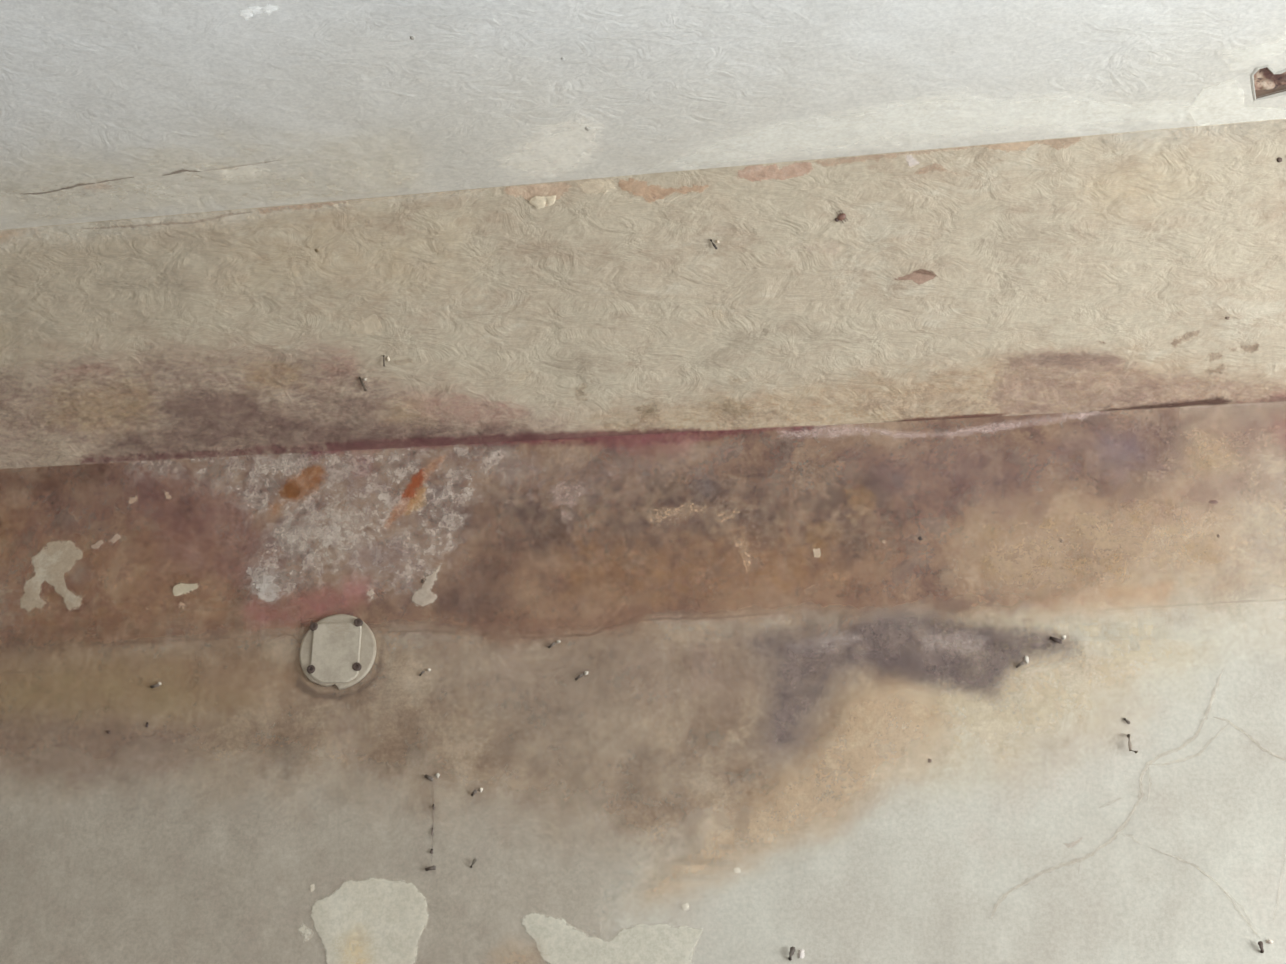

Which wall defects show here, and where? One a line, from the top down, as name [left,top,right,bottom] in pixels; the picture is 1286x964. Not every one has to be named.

spalling [1250,65,1286,101]
rust [402,469,424,498]
peeling [20,534,121,611]
damp [0,358,1286,964]
peeling [299,878,428,964]
peeling [522,913,702,964]